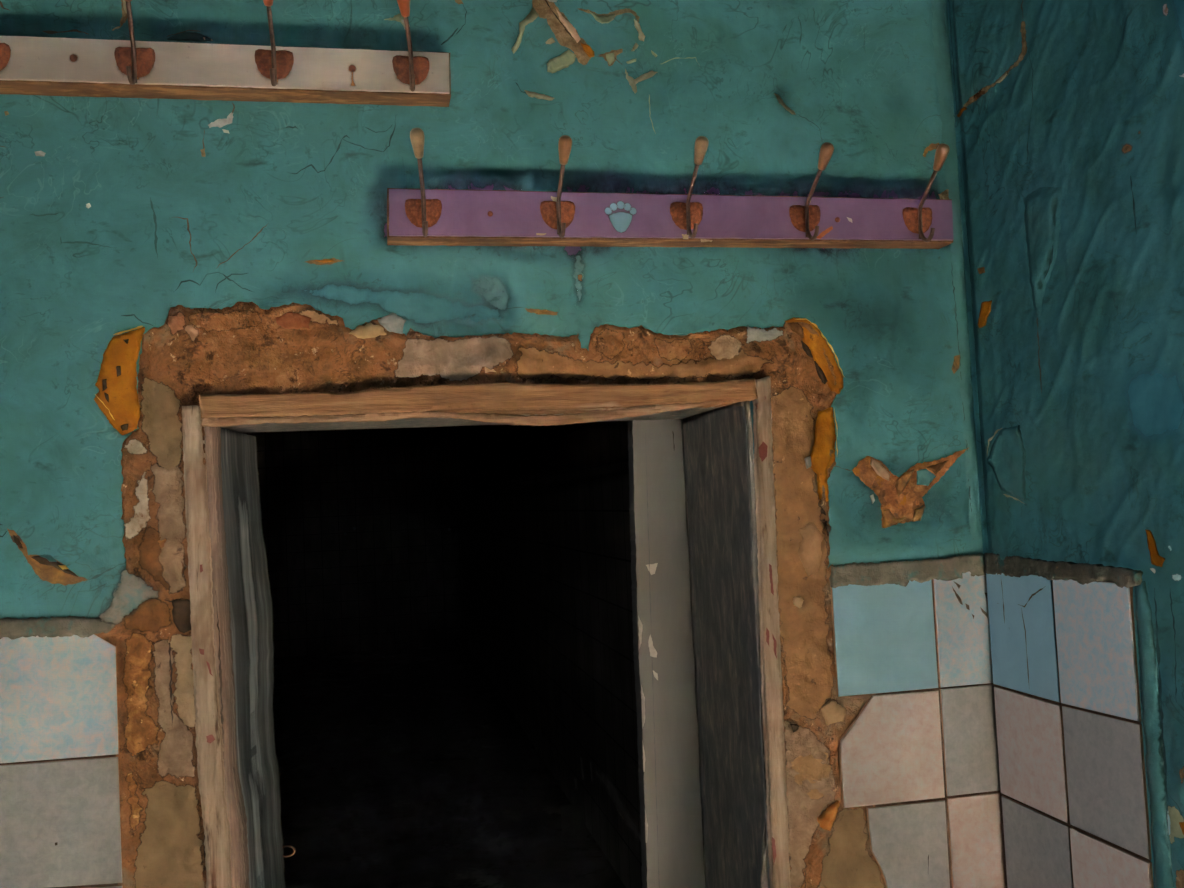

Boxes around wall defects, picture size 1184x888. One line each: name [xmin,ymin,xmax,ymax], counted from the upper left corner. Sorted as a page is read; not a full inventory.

peeling [511,0,658,93]
peeling [852,447,969,528]
flaking render [94,302,886,888]